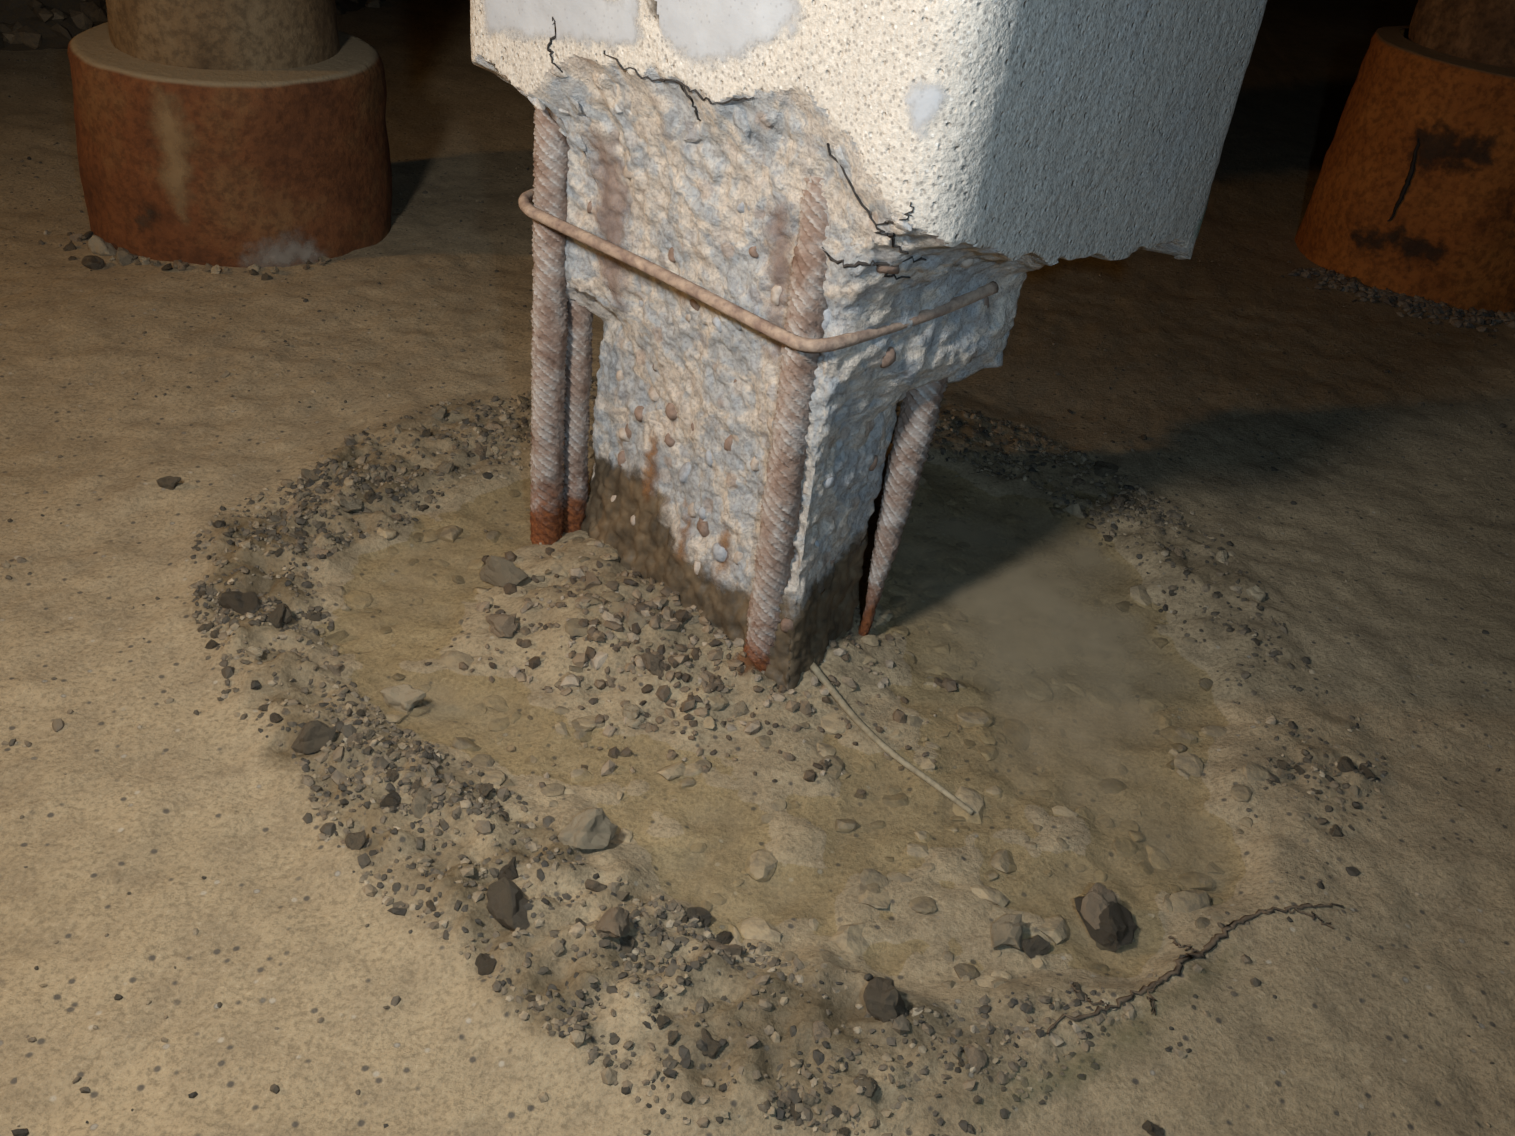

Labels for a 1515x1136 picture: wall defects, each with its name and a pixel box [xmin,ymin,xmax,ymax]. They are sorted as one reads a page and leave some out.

crack [547,17,563,73]
rust [594,142,626,295]
crack [603,50,754,121]
rust [771,208,790,349]
spalling [472,0,1112,632]
crack [822,143,926,280]
spalling [1138,239,1189,260]
water stain [1350,226,1446,262]
water stain [1416,126,1494,171]
crack [1047,903,1344,1035]